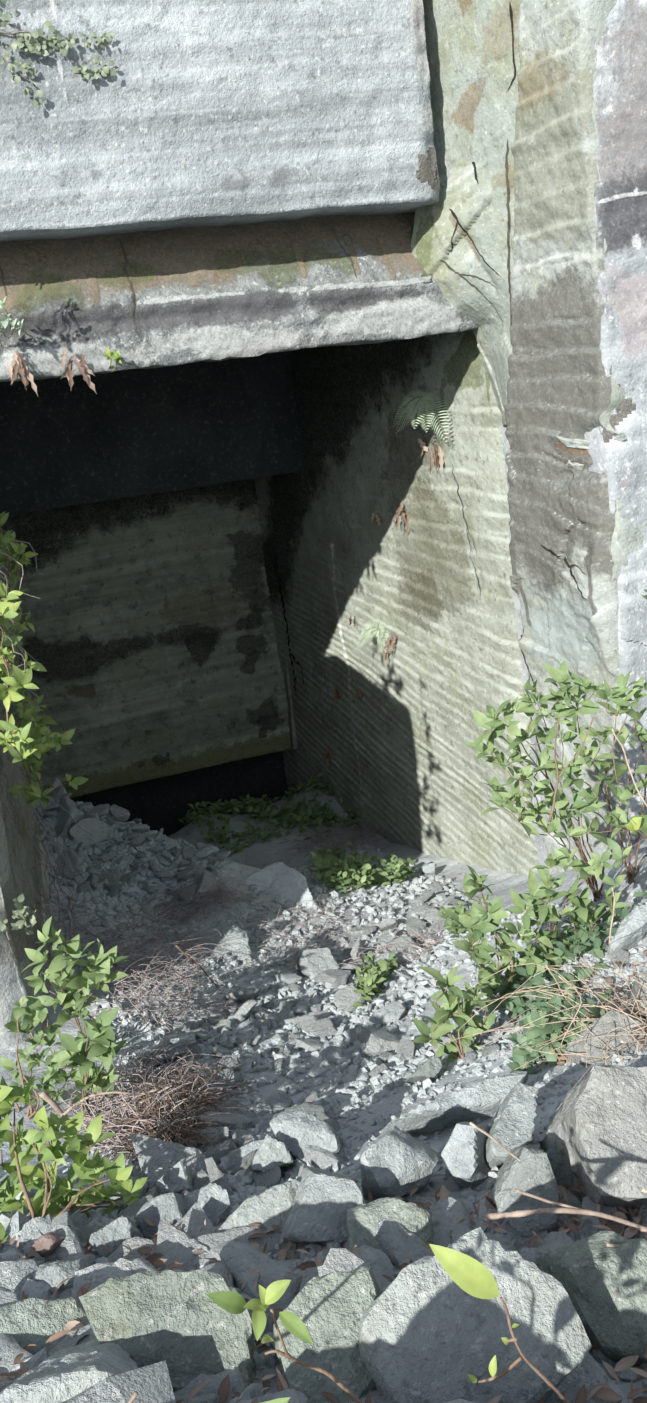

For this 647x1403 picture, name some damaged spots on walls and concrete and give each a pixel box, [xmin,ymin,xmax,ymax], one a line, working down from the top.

crack [506,4,516,92]
crack [119,239,140,337]
crack [440,139,511,326]
leakage [0,331,489,697]
leakage [505,268,616,666]